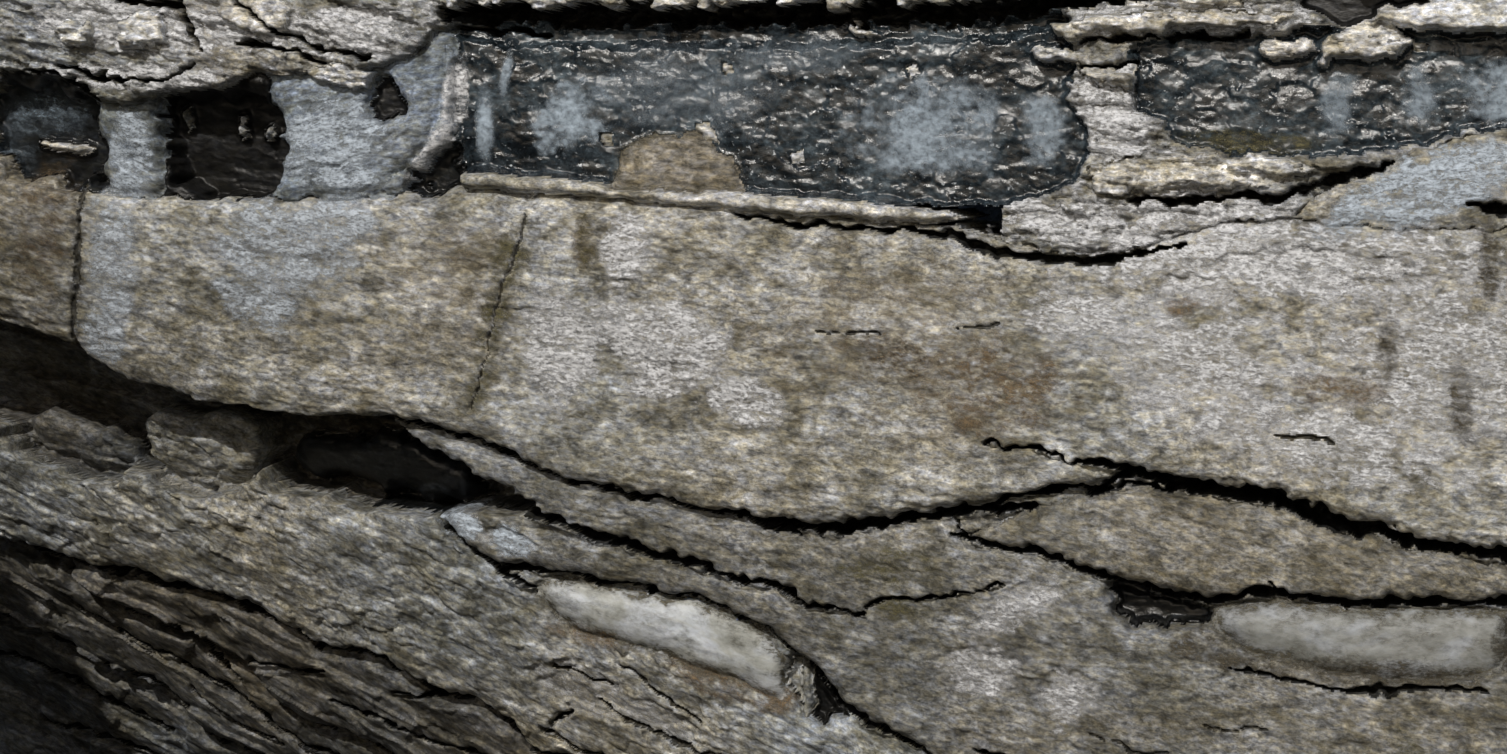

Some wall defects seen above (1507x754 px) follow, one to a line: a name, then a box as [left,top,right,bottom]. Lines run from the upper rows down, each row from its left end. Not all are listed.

peeling [219,0,293,37]
peeling [697,0,720,13]
peeling [826,0,882,39]
peeling [1030,0,1507,90]
peeling [303,63,379,91]
peeling [906,64,920,78]
peeling [239,115,278,141]
peeling [695,122,719,144]
peeling [790,149,804,163]
crack [70,183,91,346]
crack [396,213,1507,754]
crack [0,541,721,754]